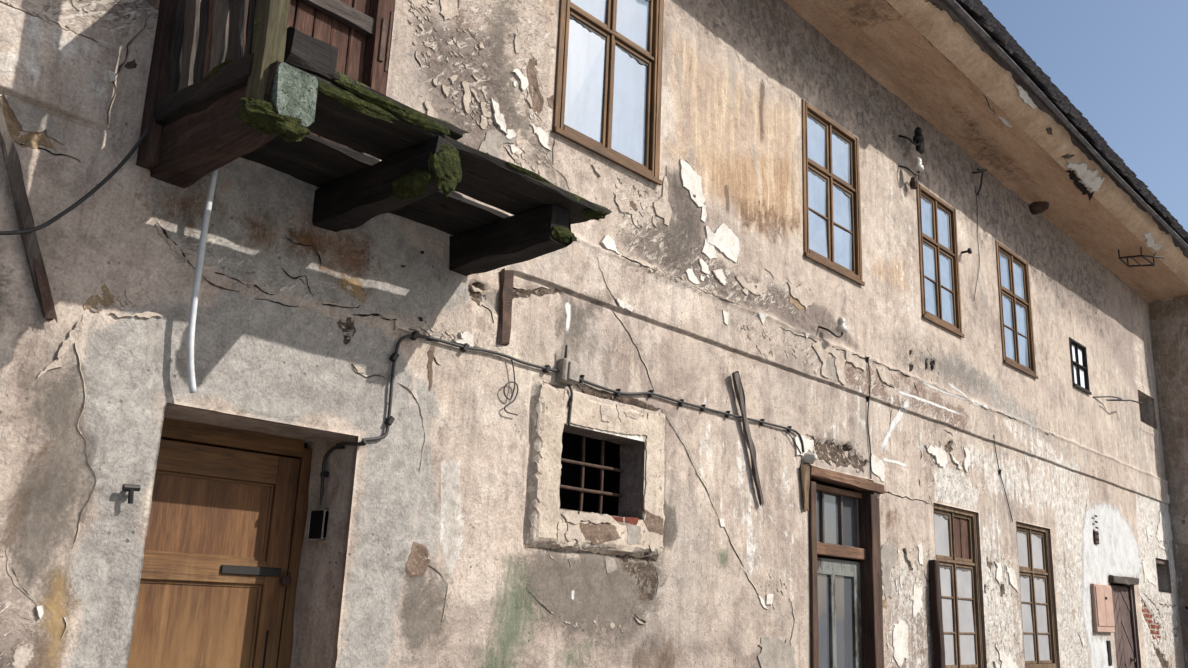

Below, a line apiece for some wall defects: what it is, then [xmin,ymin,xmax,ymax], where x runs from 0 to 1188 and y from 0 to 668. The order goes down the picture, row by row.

peeling [408,0,555,174]
peeling [613,177,644,229]
water stain [711,0,1108,333]
flaking render [1060,154,1105,201]
crack [155,222,392,321]
crack [36,314,96,548]
crack [597,235,759,596]
spalling [561,509,664,551]
peeling [1146,483,1188,583]
flaking render [881,539,930,667]
flaking render [984,555,1018,668]
flaking render [1139,559,1188,668]